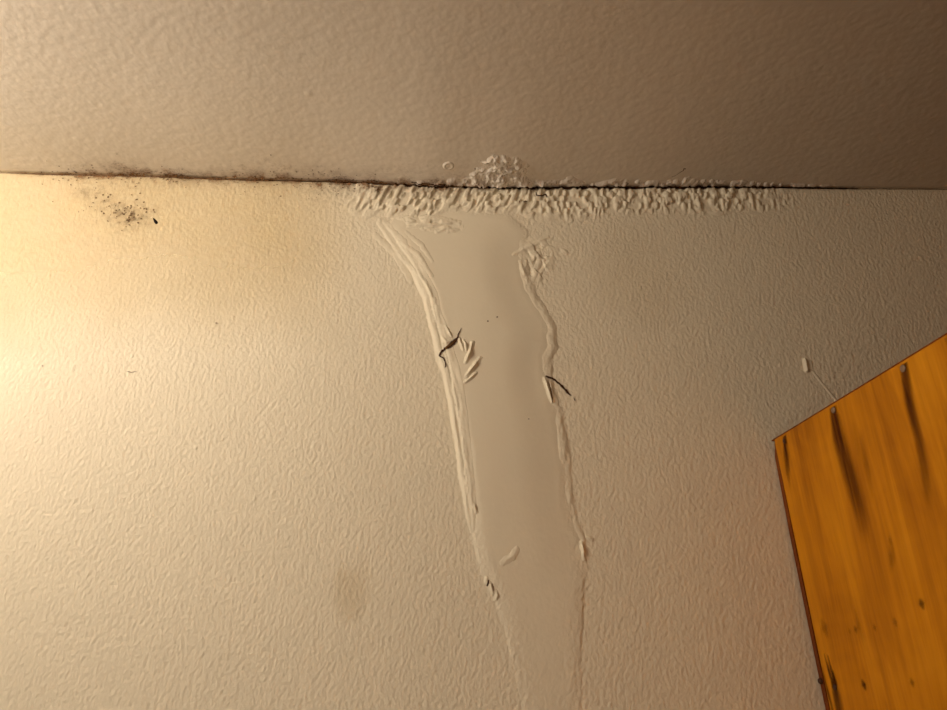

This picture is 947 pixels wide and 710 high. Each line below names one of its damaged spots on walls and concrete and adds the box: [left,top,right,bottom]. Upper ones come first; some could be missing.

water stain [22,166,192,235]
crack [129,169,863,206]
crack [439,329,461,367]
crack [545,375,575,402]